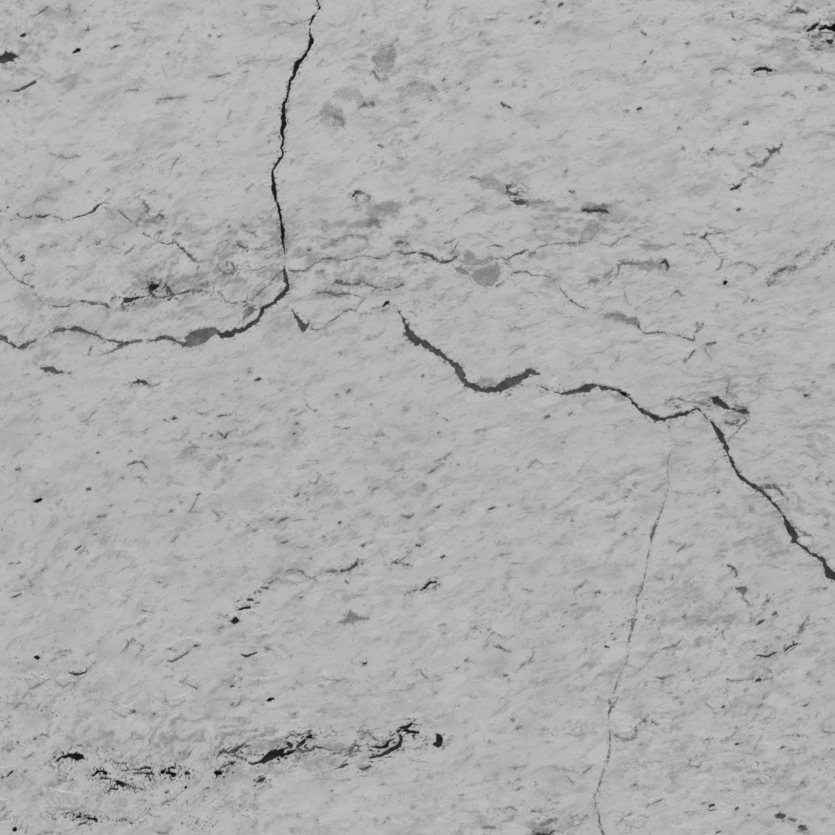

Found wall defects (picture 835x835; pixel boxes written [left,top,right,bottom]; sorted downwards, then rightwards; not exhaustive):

crack [0,0,835,583]
crack [237,569,304,610]
crack [594,510,662,835]